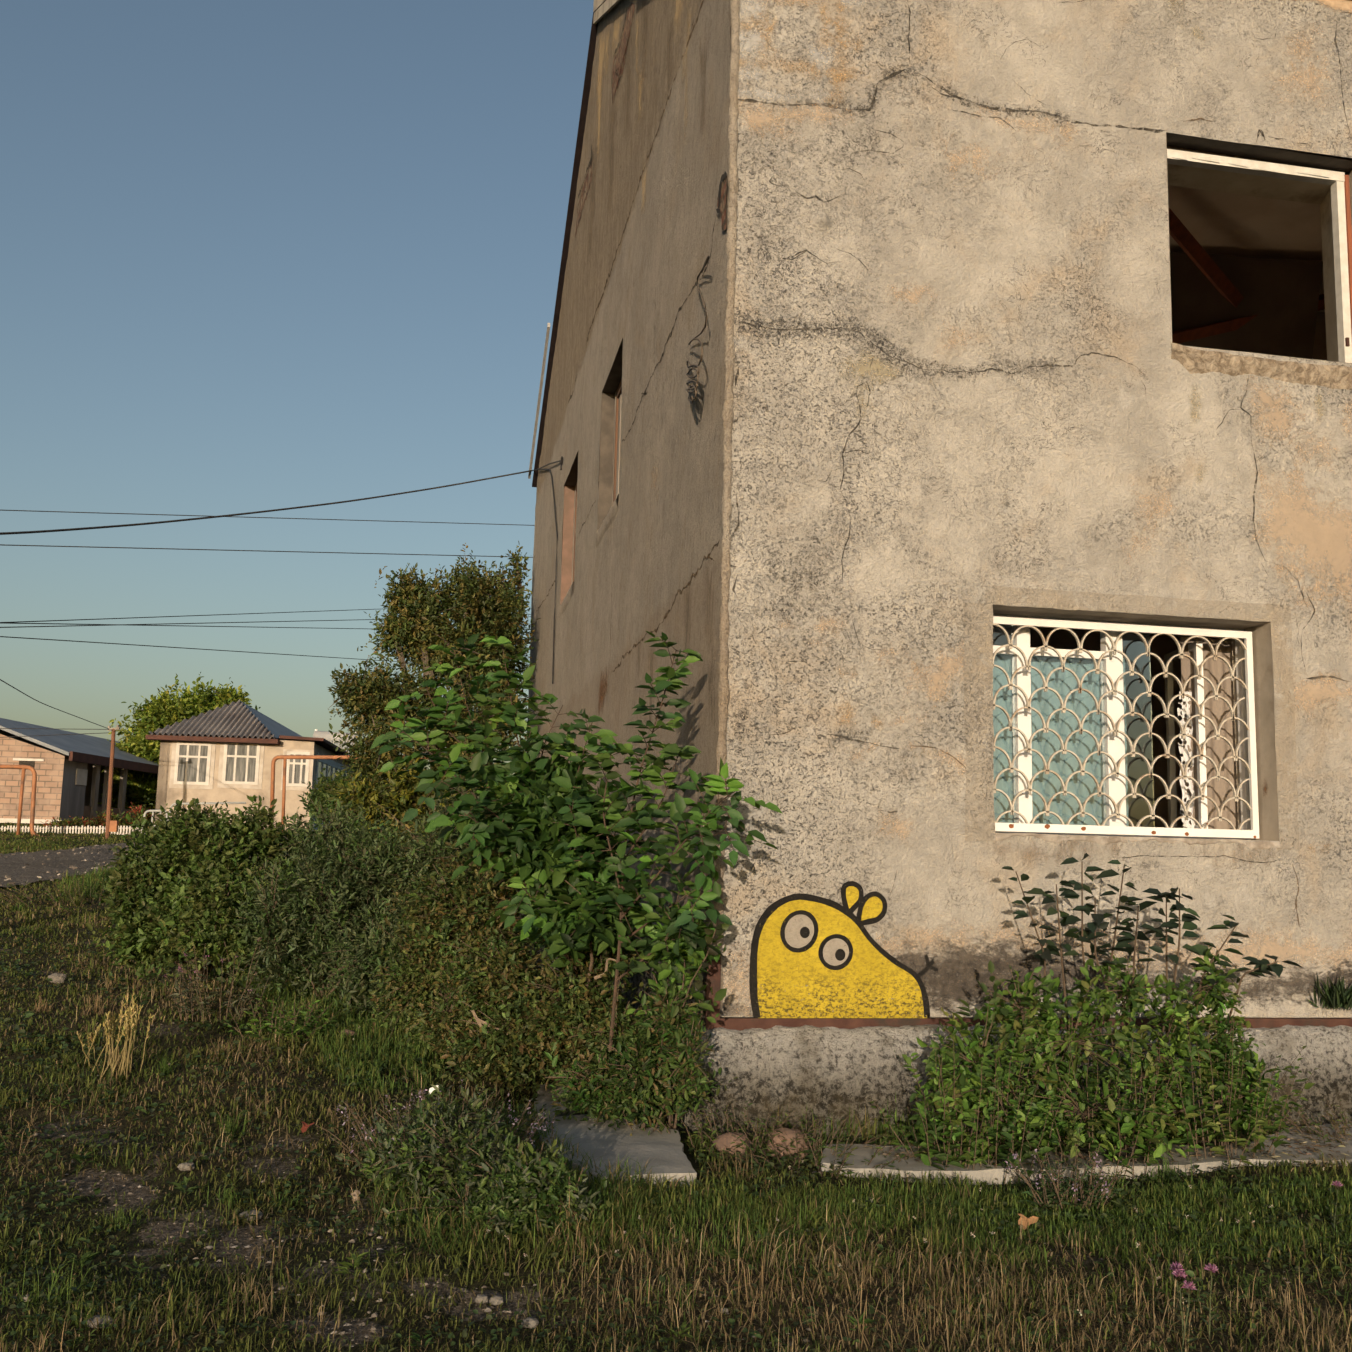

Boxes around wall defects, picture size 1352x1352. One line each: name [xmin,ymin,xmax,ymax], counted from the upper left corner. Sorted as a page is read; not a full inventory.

spalling [612,3,635,103]
crack [587,0,704,341]
spalling [716,171,727,231]
crack [738,6,1213,202]
crack [622,224,715,441]
crack [738,315,1149,591]
crack [610,539,720,672]
leakage [883,929,1352,1012]